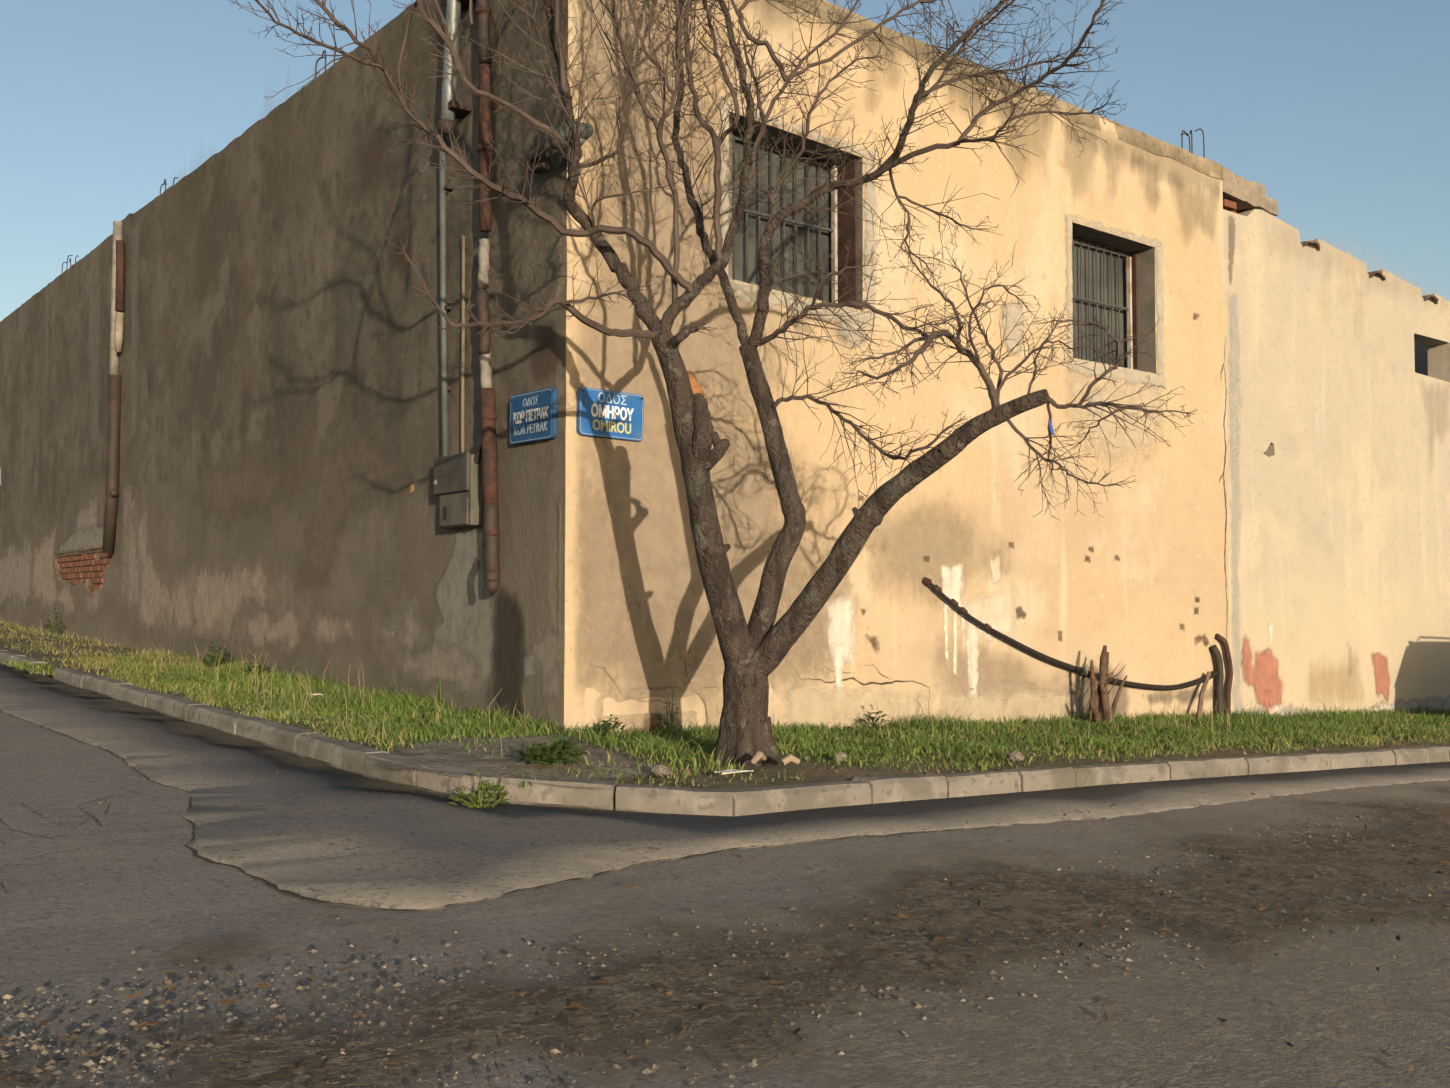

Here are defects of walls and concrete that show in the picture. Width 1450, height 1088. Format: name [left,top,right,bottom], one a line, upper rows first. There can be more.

leakage [580,0,778,677]
flaking render [0,487,357,652]
leakage [773,569,802,626]
leakage [880,512,968,587]
leakage [800,614,853,690]
leakage [943,604,991,707]